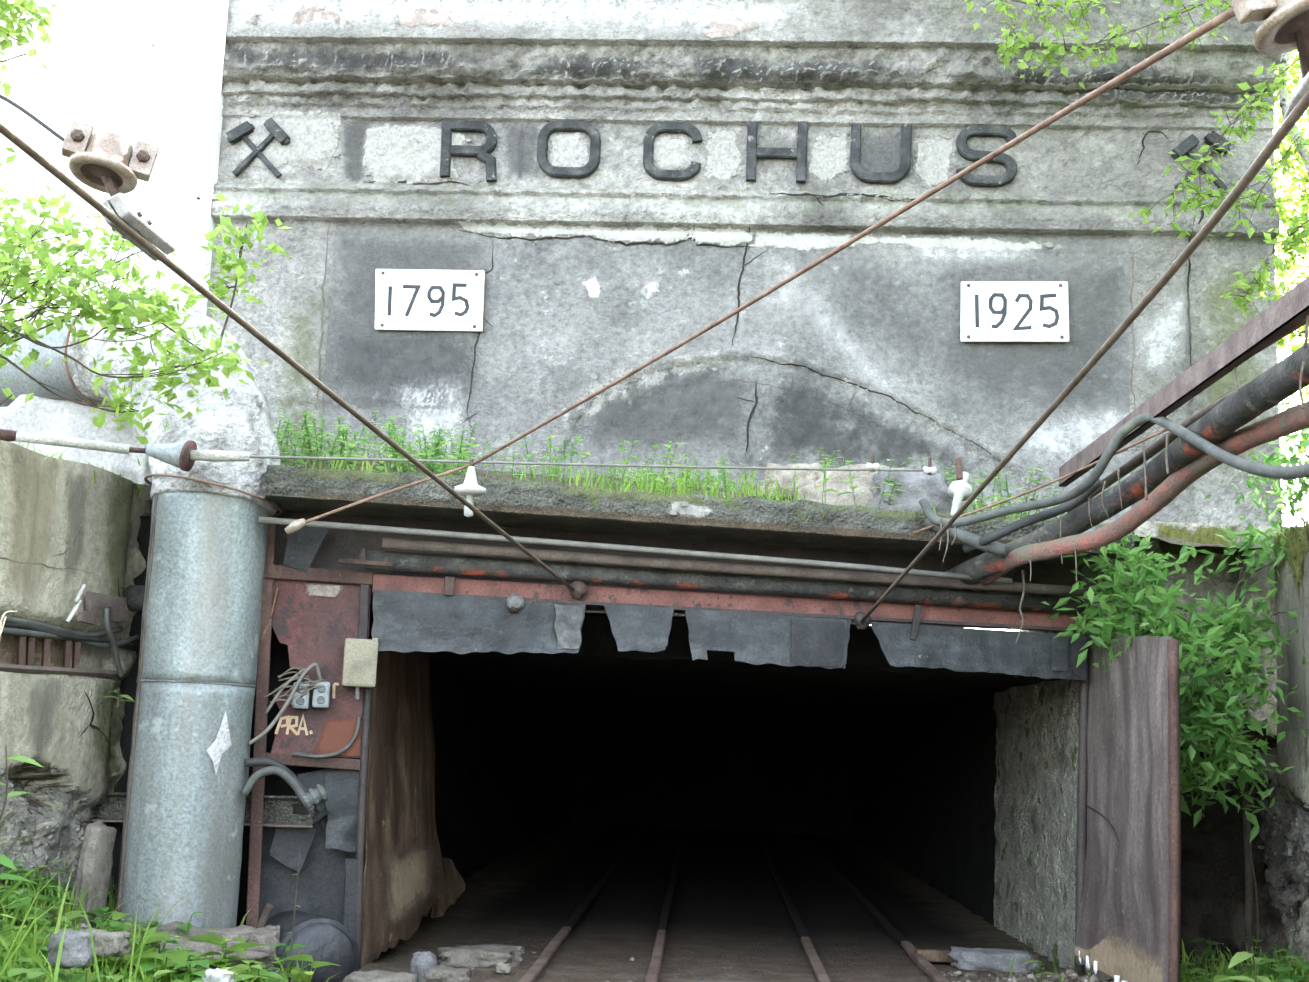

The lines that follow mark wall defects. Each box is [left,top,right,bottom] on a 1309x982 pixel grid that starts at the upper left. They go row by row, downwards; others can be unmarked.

crack [459,227,1000,465]
crack [427,316,493,449]
corrosion [434,502,791,530]
corrosion [813,528,960,542]
crack [0,548,92,574]
corrosion [307,584,341,597]
damp [1287,550,1309,768]
corrosion [318,719,362,756]
spalling [1180,774,1309,964]